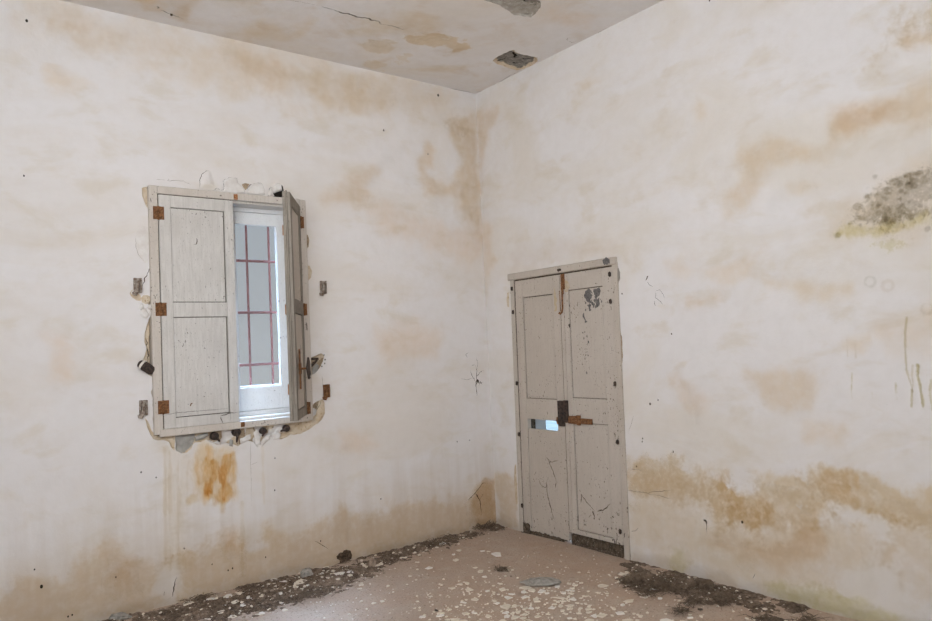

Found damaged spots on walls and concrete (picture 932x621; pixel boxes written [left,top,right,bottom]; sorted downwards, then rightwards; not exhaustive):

flaking render [493,50,538,70]
flaking render [223,177,284,197]
flaking render [130,289,151,363]
flaking render [145,401,325,453]